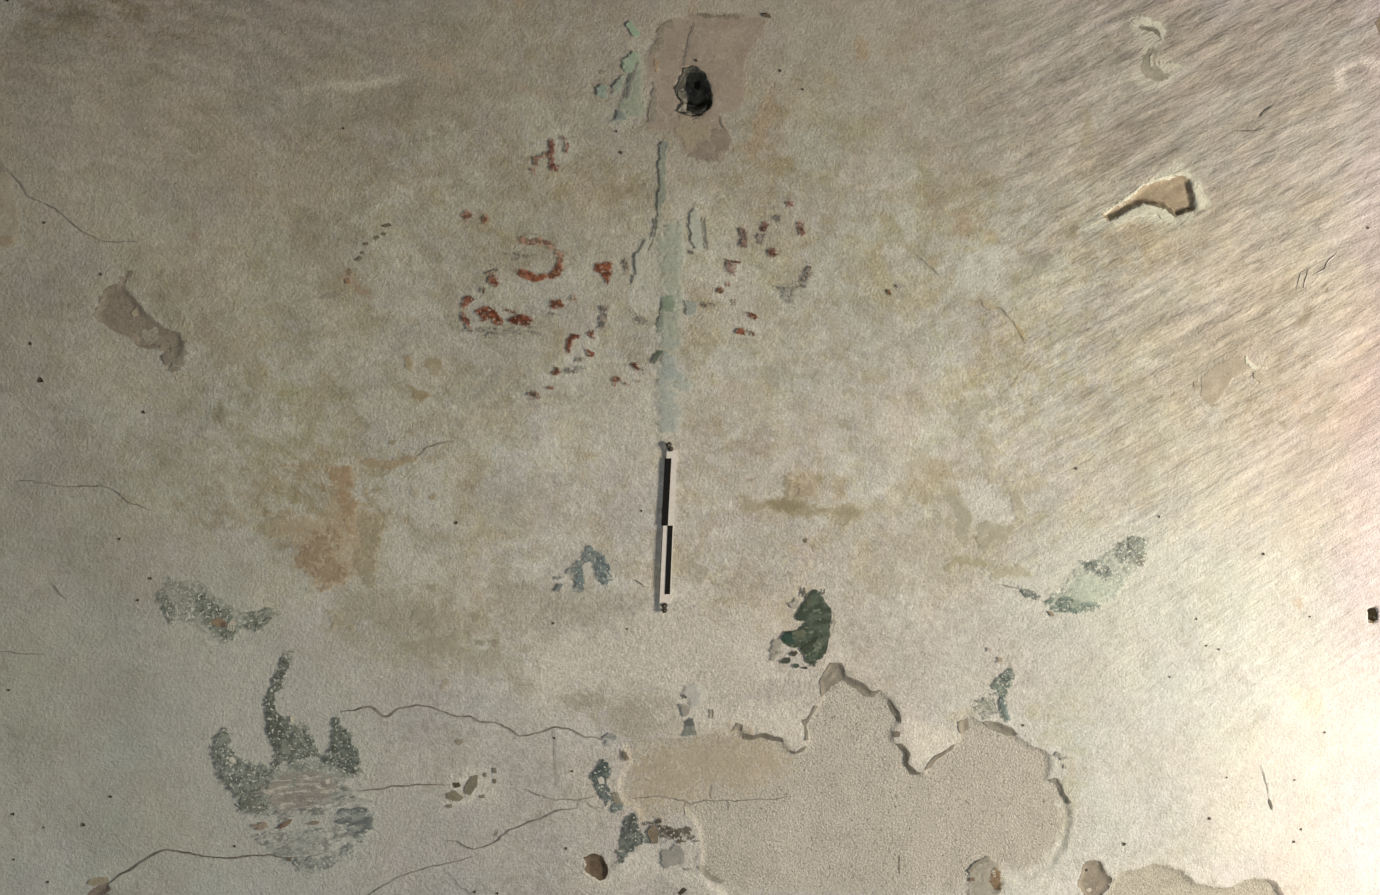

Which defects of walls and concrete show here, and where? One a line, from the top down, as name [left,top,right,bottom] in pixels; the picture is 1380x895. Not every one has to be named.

spalling [1102,171,1207,224]
spalling [93,270,188,373]
peeling [1081,536,1147,581]
peeling [1021,586,1100,614]
crack [341,704,602,895]
flaking render [612,651,1072,895]
crack [108,849,332,895]
flaking render [1078,860,1284,895]